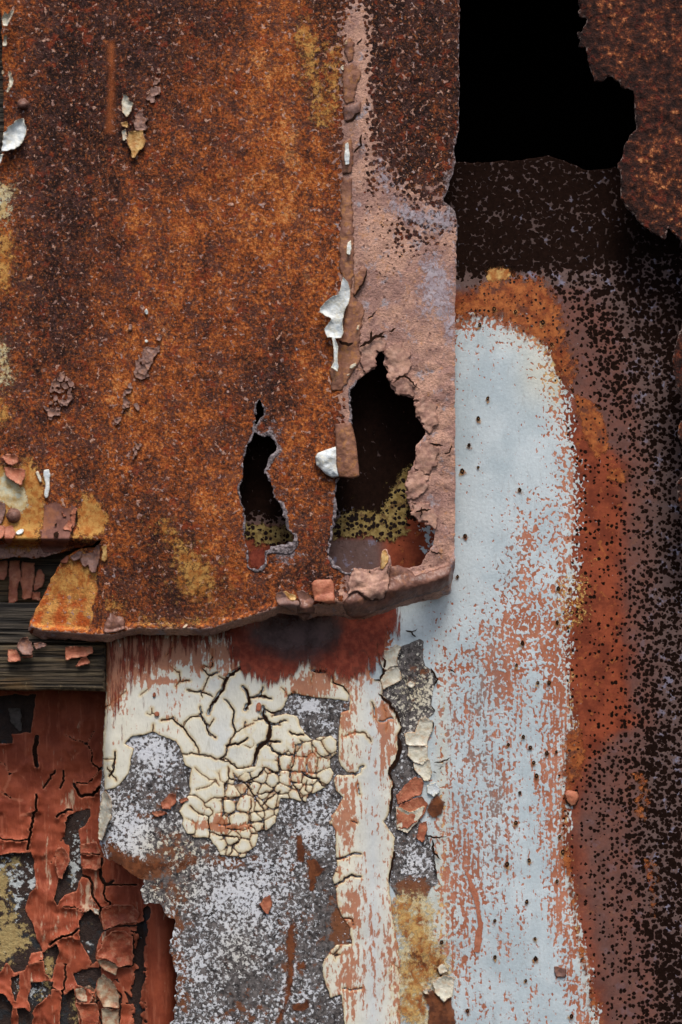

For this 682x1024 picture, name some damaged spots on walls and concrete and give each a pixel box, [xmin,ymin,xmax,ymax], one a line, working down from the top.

rust [0,0,610,724]
peeling [320,277,360,376]
peeling [0,502,24,544]
peeling [1,454,51,498]
crack [312,669,349,694]
crack [1,737,116,850]
crack [50,929,78,945]
spalling [0,624,445,1024]
crack [152,654,331,856]
rust [391,895,446,1024]
rust [465,870,483,953]
rust [559,727,598,1007]